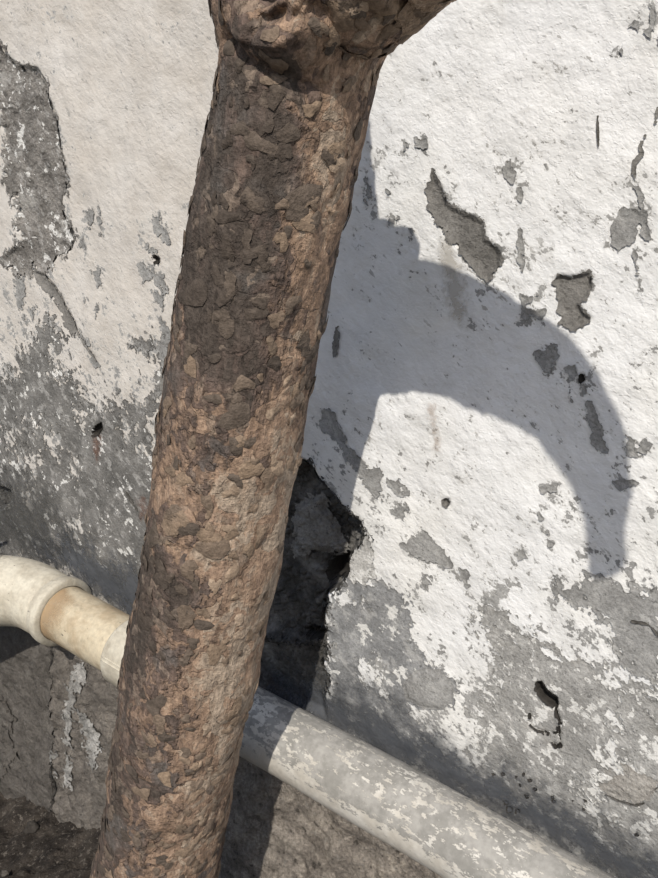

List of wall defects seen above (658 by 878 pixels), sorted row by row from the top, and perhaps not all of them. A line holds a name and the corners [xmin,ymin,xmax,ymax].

peeling [628,4,658,39]
peeling [403,136,428,151]
flaking render [424,168,504,283]
peeling [502,159,524,202]
peeling [515,228,526,272]
peeling [610,185,651,275]
peeling [0,39,171,611]
flaking render [518,269,594,332]
peeling [533,343,609,453]
peeling [319,408,410,520]
peeling [625,434,653,458]
peeling [258,457,658,867]